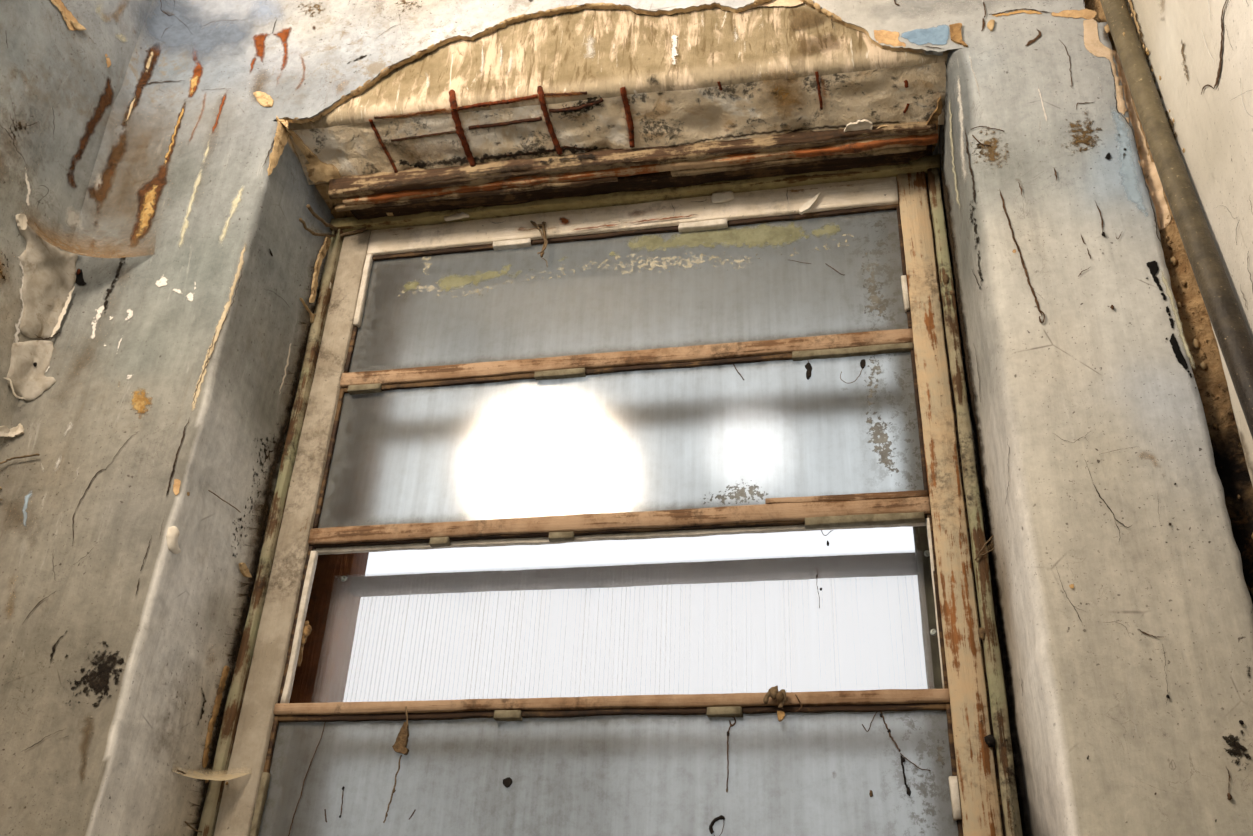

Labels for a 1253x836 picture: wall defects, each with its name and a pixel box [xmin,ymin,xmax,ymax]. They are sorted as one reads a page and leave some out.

peeling [51,0,86,31]
corrosion [250,20,291,71]
crack [1201,0,1251,98]
corrosion [67,43,161,224]
corrosion [104,51,205,313]
corrosion [386,106,466,118]
corrosion [377,138,614,169]
corrosion [549,92,602,117]
spalling [253,0,983,289]
crack [1000,191,1045,323]
water stain [66,641,124,707]